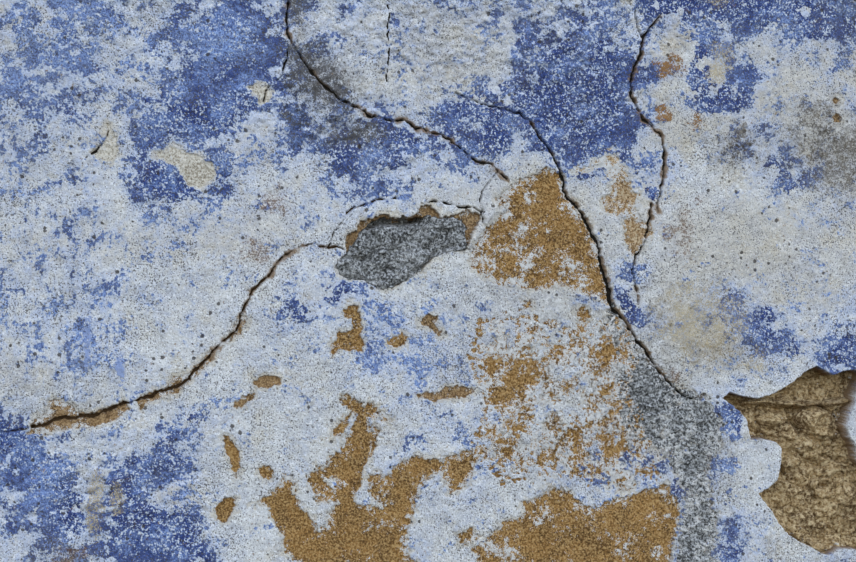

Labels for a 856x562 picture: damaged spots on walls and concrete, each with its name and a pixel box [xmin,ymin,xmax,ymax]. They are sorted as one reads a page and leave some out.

peeling [134,145,241,203]
peeling [128,83,272,138]
crack [11,197,396,431]
crack [282,0,507,180]
crack [429,191,483,220]
flaking render [258,0,856,562]
crack [457,94,692,399]
crack [629,11,665,292]